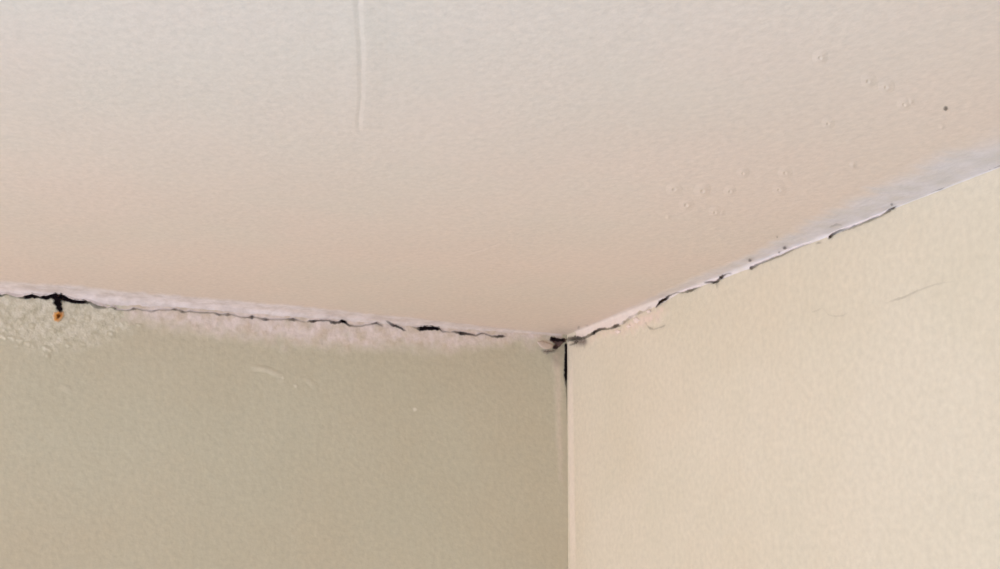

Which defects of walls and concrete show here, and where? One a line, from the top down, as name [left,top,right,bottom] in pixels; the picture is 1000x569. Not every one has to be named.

crack [655,207,895,308]
rust [52,311,64,323]
crack [0,291,505,338]
crack [590,324,618,336]
crack [561,344,569,387]